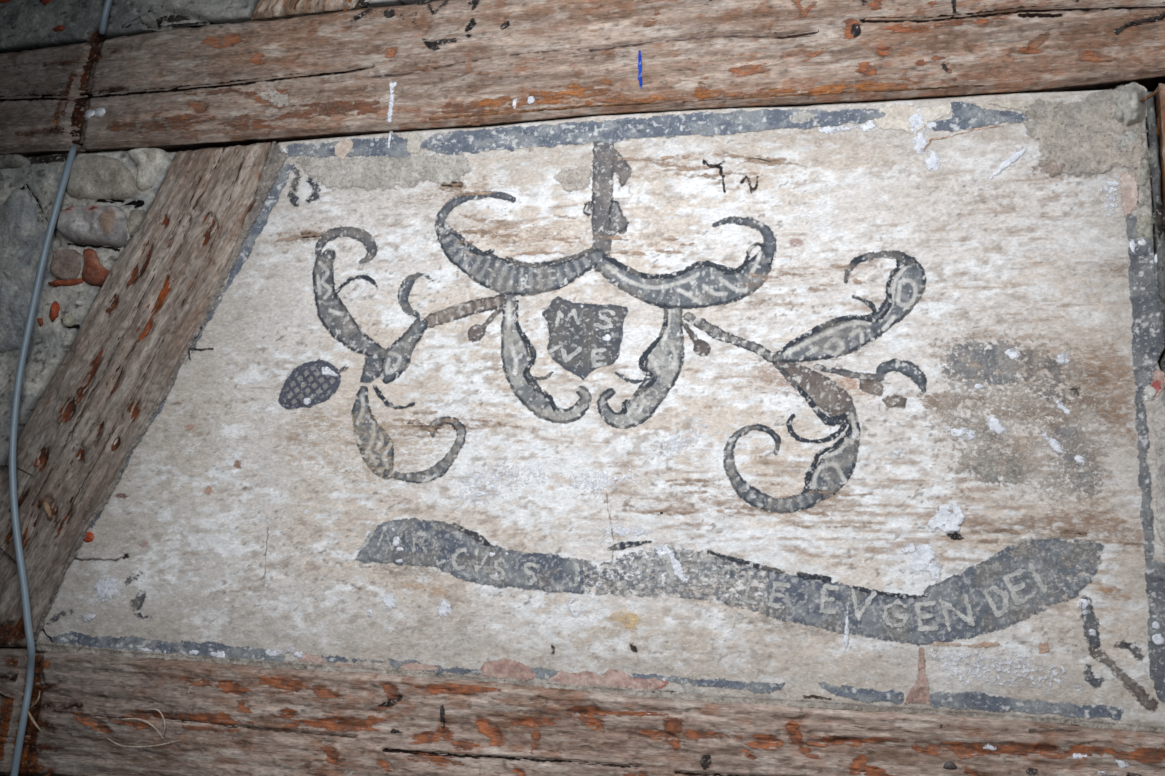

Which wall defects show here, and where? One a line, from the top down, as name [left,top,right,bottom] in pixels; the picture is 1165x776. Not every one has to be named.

peeling [1032,160,1066,177]
flaking render [73,646,667,776]